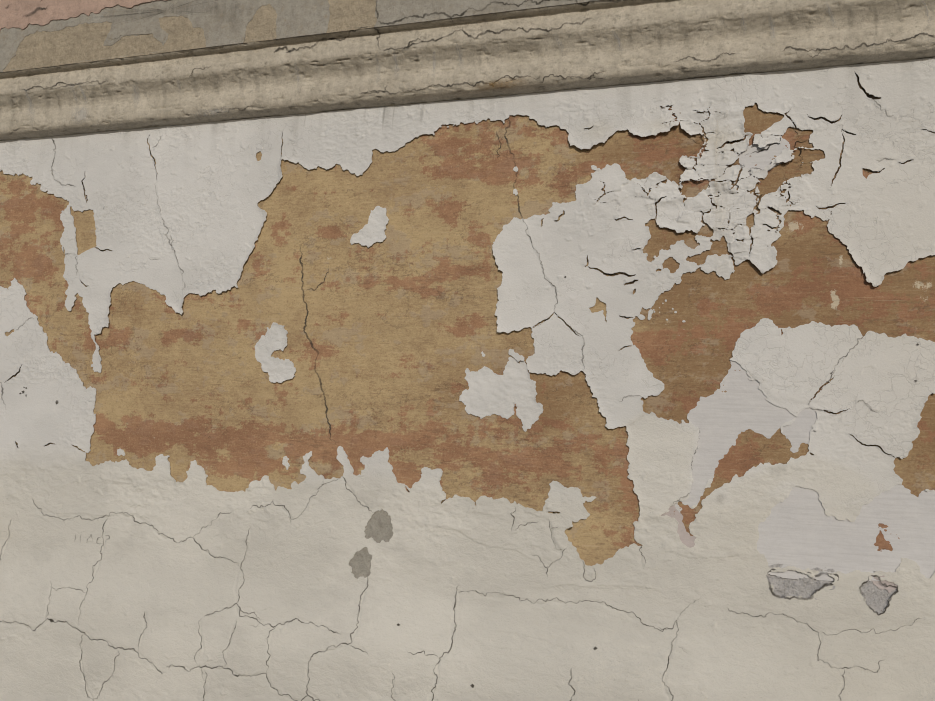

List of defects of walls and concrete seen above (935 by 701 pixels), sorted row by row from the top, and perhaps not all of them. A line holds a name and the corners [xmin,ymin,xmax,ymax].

peeling [3,16,206,72]
peeling [321,0,377,34]
crack [329,0,563,50]
crack [785,33,934,57]
crack [363,75,518,94]
crack [299,255,329,348]
peeling [0,103,935,566]
flaking render [349,509,393,579]
crack [0,506,368,701]
flaking render [766,564,838,600]
flaking render [860,571,899,615]
crack [410,578,679,701]